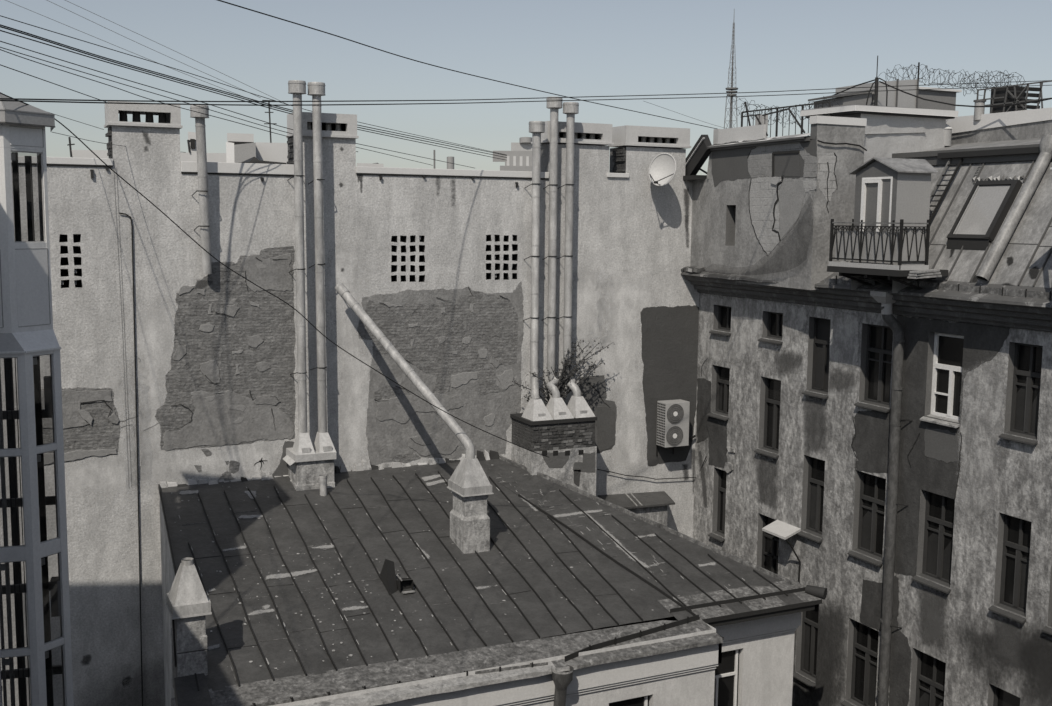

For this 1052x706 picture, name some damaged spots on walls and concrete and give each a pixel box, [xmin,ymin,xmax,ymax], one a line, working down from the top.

crack [747,147,784,256]
crack [826,153,837,213]
peeling [178,253,293,332]
flaking render [358,290,518,424]
peeling [35,389,113,429]
peeling [163,390,295,451]
peeling [388,432,458,463]